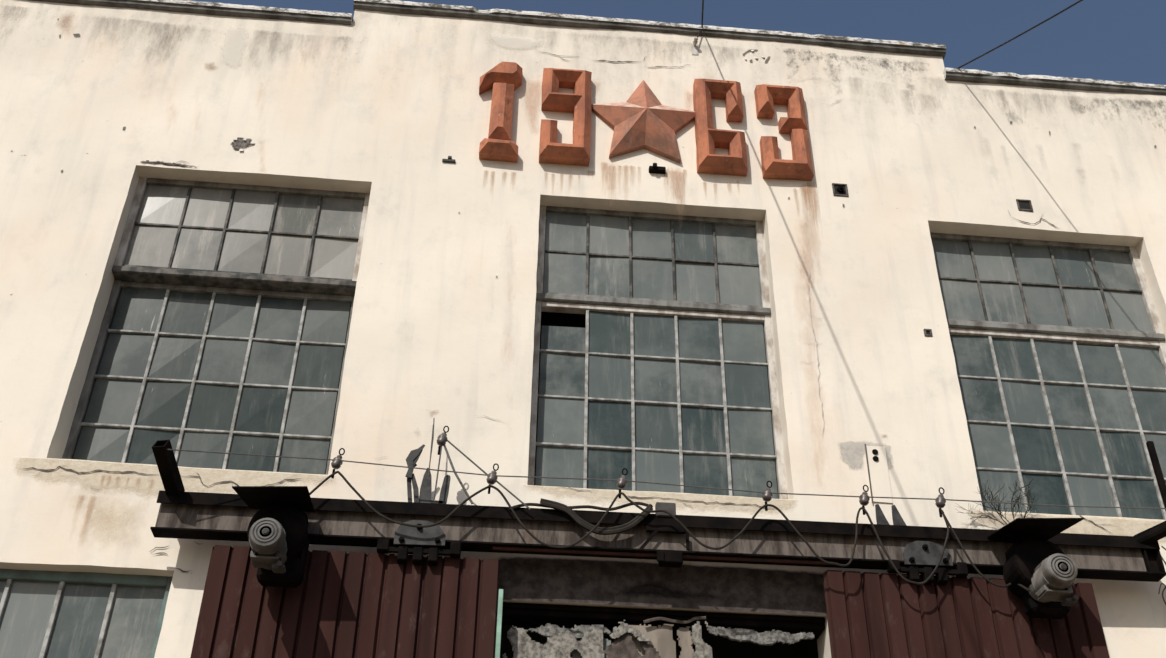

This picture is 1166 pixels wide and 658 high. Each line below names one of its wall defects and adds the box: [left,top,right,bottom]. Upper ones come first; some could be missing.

spalling [231,137,255,151]
crack [24,465,302,490]